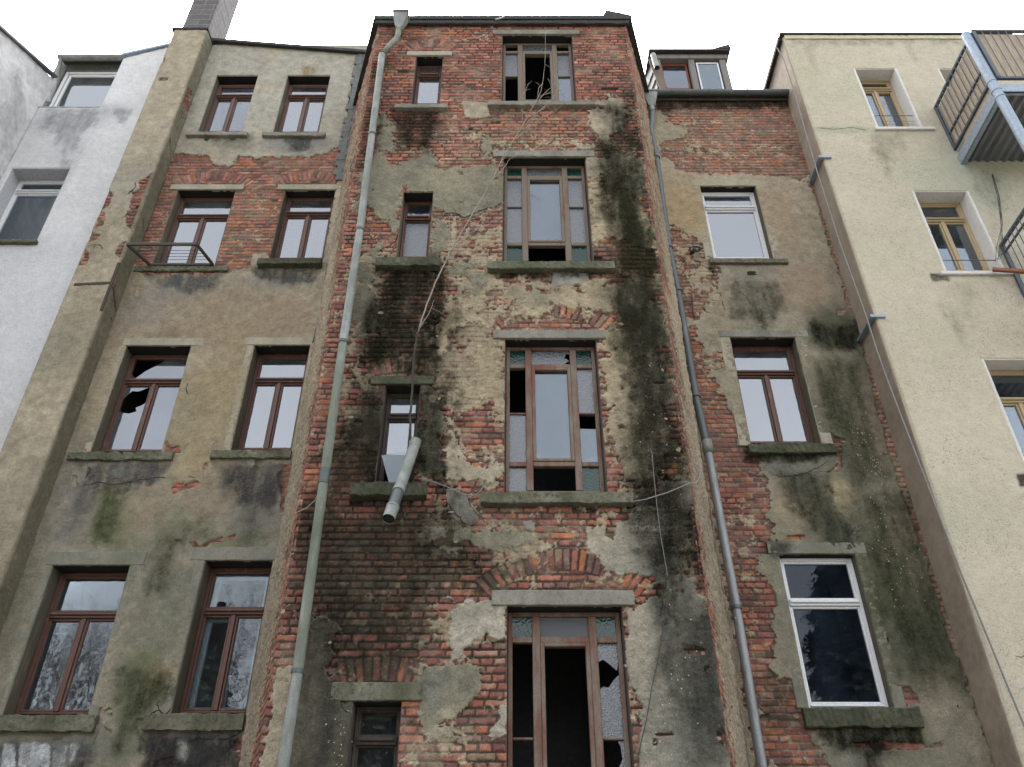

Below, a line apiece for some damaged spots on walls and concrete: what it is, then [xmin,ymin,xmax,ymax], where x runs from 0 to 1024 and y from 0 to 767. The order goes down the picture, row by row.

spalling [79,189,114,266]
spalling [126,173,151,229]
crack [84,467,165,486]
spalling [135,25,507,767]
leakage [342,389,383,483]
leakage [360,270,458,489]
flaking render [424,488,536,554]
leakage [598,104,703,582]
spalling [501,26,853,767]
leakage [810,320,859,350]
spalling [819,331,987,741]